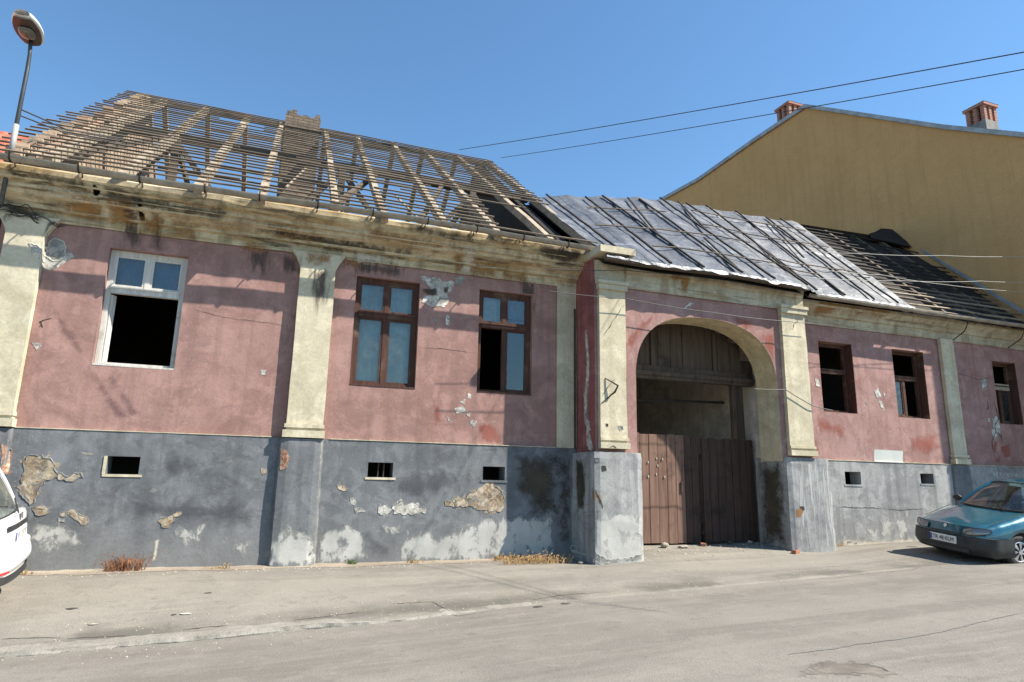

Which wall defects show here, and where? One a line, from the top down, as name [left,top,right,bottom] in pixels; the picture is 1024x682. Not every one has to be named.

damp [108,190,225,246]
flaking render [29,236,74,271]
damp [270,225,410,275]
damp [412,225,476,272]
flaking render [420,275,467,327]
flaking render [0,443,89,526]
damp [32,525,78,552]
flaking render [157,511,182,528]
damp [268,525,365,566]
flaking render [336,485,427,518]
flaking render [444,482,506,515]
damp [385,458,585,560]